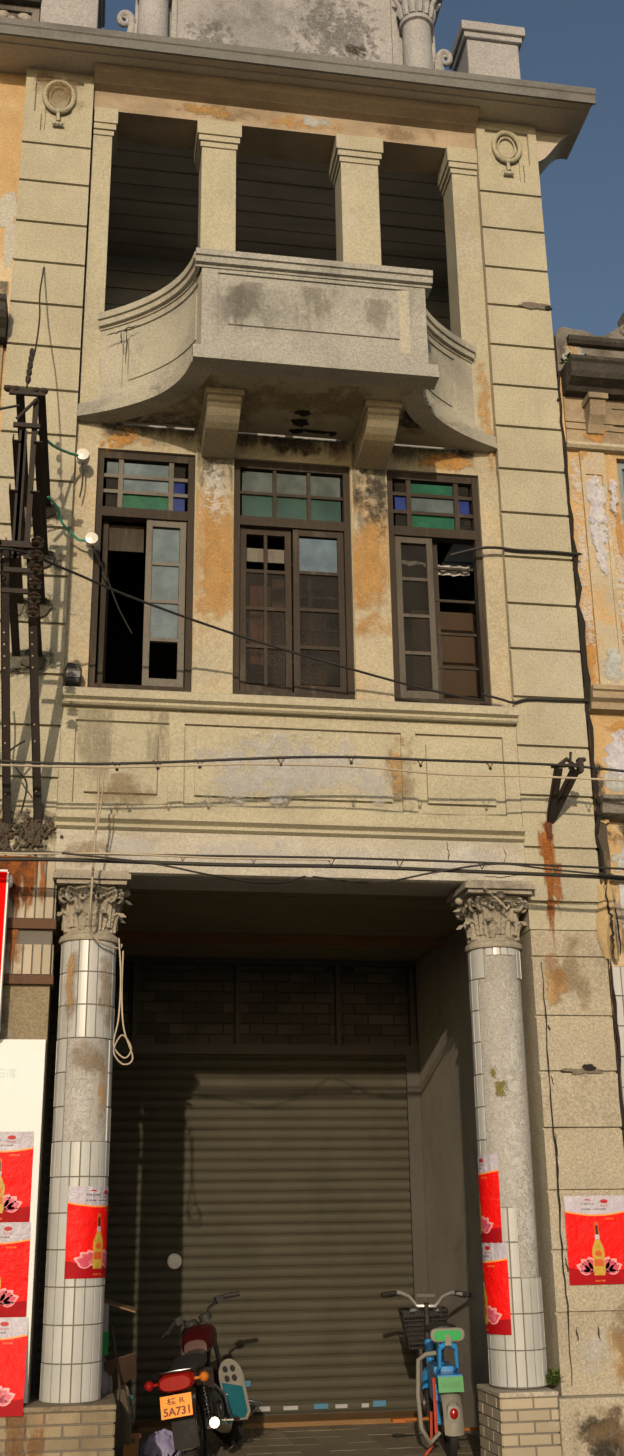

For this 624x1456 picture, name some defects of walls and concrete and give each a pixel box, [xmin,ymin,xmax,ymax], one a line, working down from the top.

leakage [101,364,493,618]
peeling [570,460,624,682]
peeling [226,735,384,803]
peeling [596,721,624,794]
corrosion [539,821,563,928]
leakage [579,1407,624,1456]